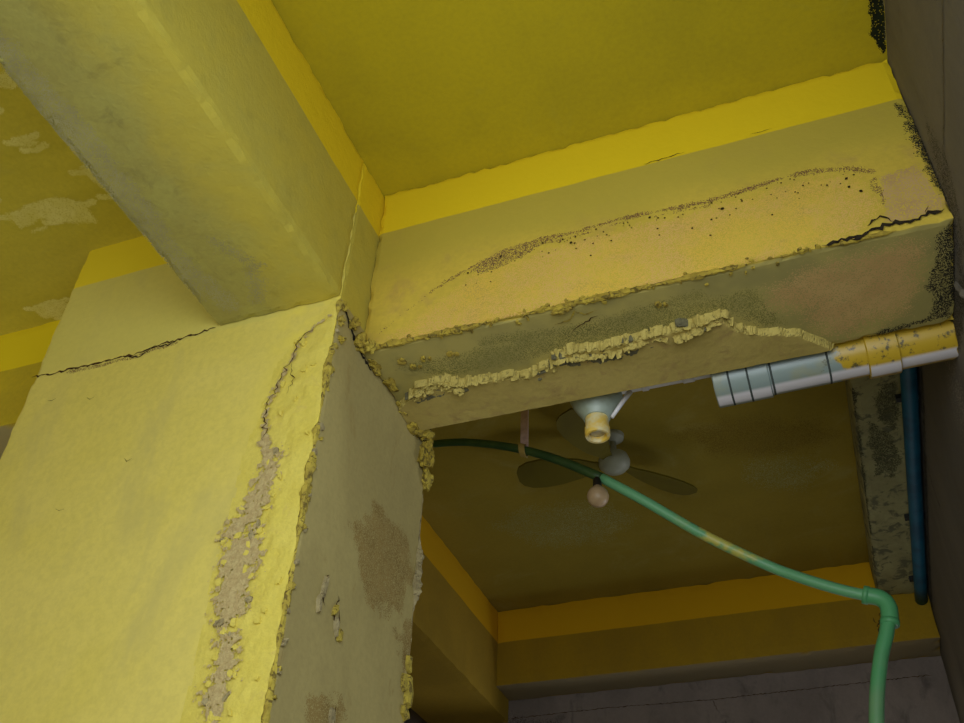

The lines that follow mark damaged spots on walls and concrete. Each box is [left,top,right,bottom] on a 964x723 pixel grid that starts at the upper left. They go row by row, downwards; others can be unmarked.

leakage [868,0,886,53]
peeling [0,164,112,232]
crack [827,207,944,245]
crack [34,327,215,378]
flaking render [192,231,895,723]
leakage [347,499,415,673]